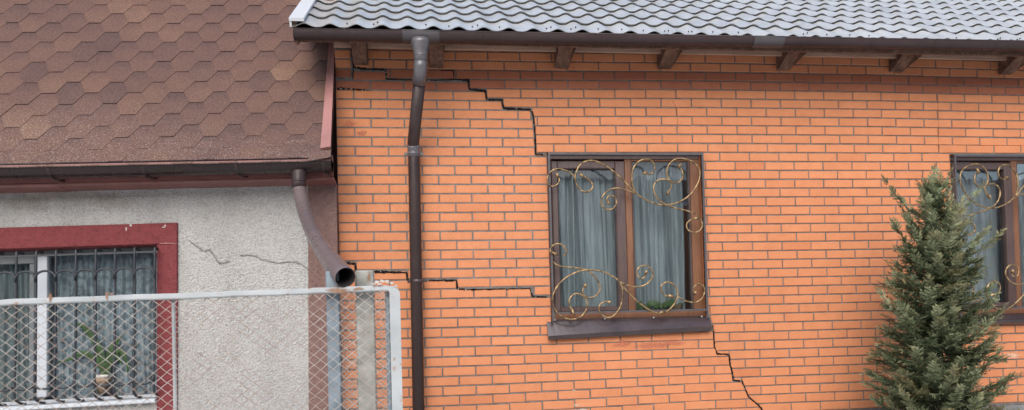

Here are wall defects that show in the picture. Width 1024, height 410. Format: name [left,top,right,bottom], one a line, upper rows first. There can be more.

crack [337,49,545,156]
crack [160,240,311,271]
crack [346,262,546,297]
crack [712,325,763,410]